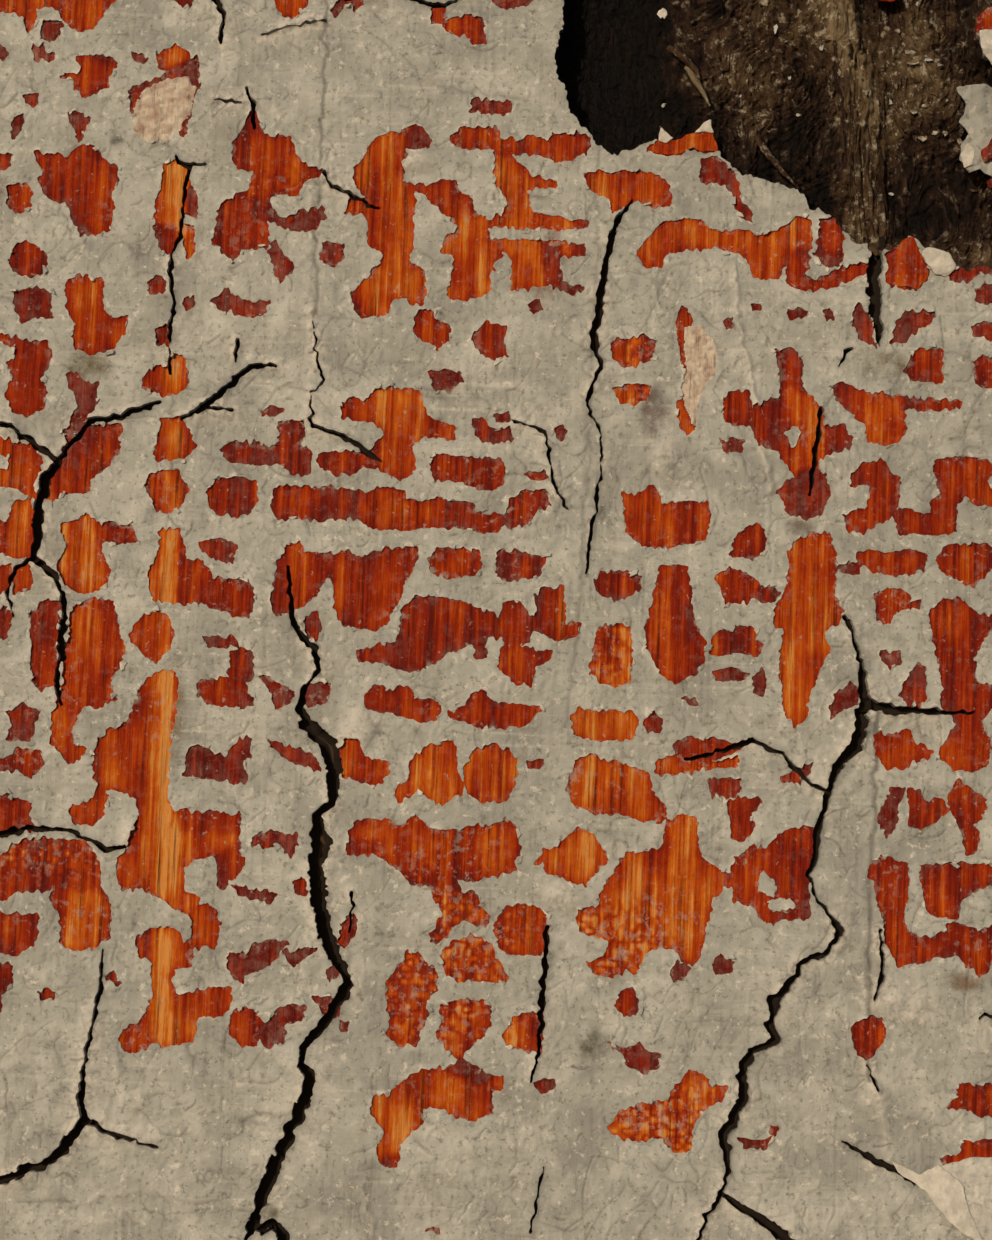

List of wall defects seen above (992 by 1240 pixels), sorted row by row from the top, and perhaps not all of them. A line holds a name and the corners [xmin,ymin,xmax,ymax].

peeling [0,240,128,418]
crack [0,157,277,706]
peeling [211,111,345,284]
peeling [344,97,591,351]
crack [513,201,633,574]
peeling [583,120,869,293]
crack [0,824,127,853]
crack [0,949,159,1184]
crack [245,566,355,1240]
peeling [0,369,814,1168]
peeling [588,303,992,978]
crack [684,616,973,1240]